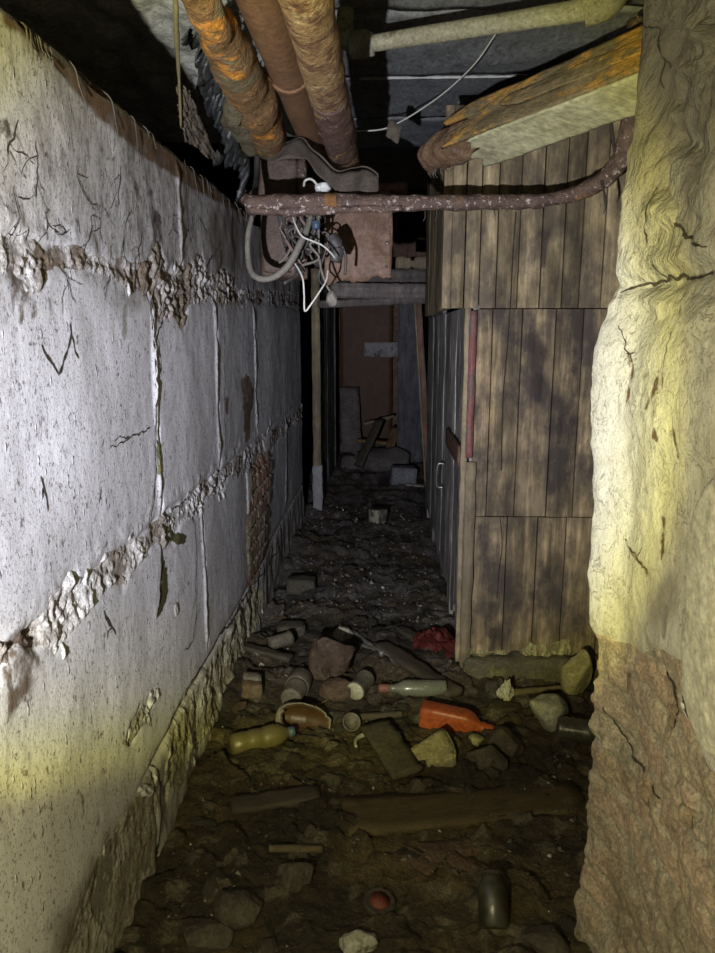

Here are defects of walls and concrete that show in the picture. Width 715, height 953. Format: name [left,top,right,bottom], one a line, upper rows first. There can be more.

crack [1,121,143,376]
flaking render [0,233,299,329]
crack [620,266,714,293]
crack [674,223,707,248]
rust [241,375,254,443]
crack [110,289,281,690]
flaking render [0,406,302,953]
crack [665,668,679,730]
crack [602,708,660,799]